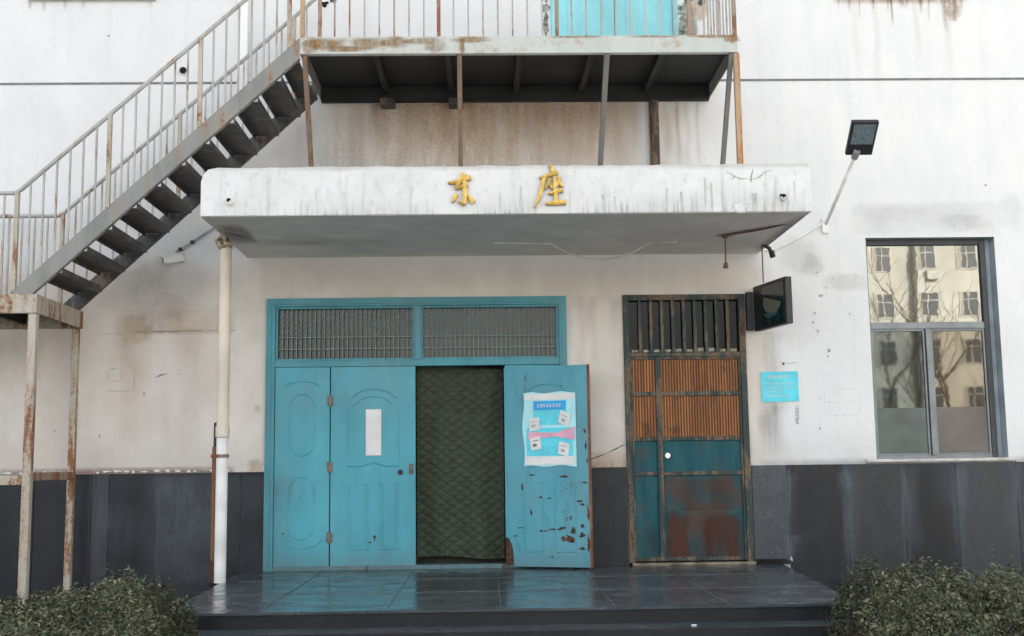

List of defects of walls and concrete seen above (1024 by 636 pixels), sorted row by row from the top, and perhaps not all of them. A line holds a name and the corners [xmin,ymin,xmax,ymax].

corrosion [305,37,432,51]
crack [727,169,771,181]
peeling [506,527,522,566]
peeling [540,500,590,552]
corrosion [668,514,689,557]